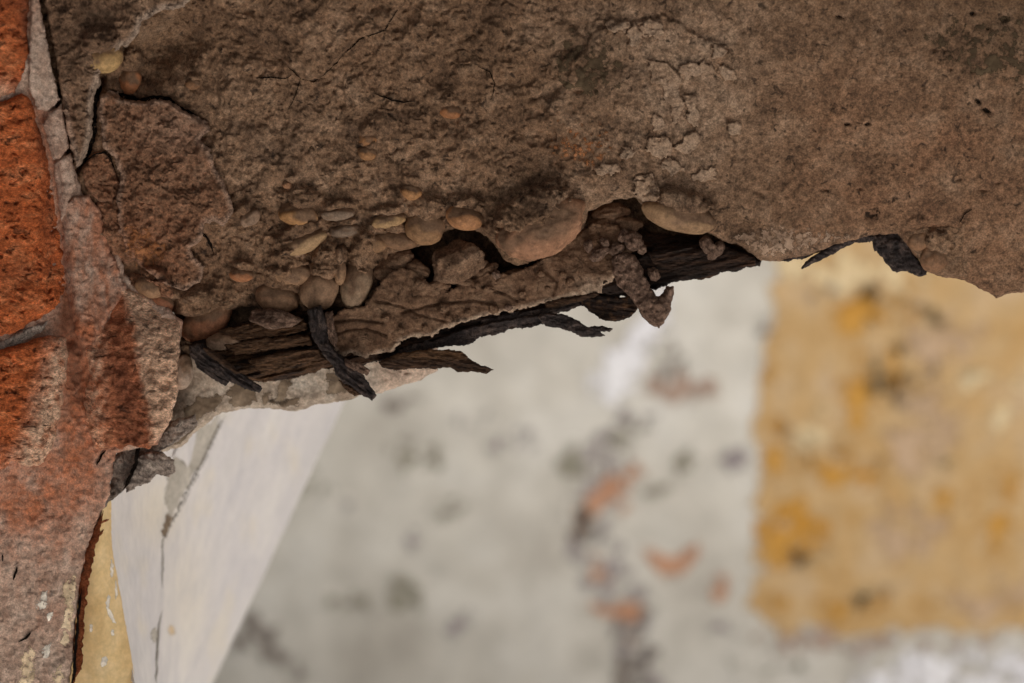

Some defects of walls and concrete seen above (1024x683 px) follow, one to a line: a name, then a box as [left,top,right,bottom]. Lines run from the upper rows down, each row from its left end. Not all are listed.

crack [258,10,398,107]
crack [78,80,209,173]
spalling [367,229,521,300]
spalling [180,336,193,354]
spalling [227,306,302,329]
peeling [647,371,719,406]